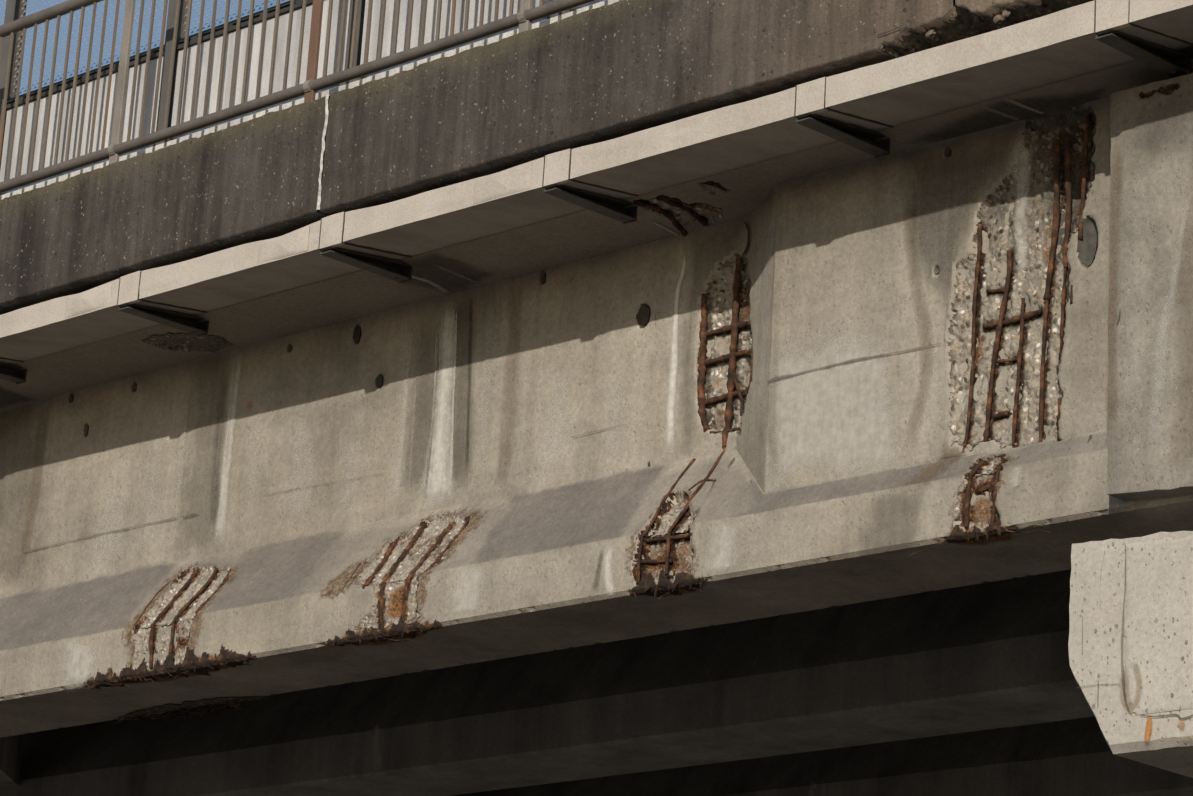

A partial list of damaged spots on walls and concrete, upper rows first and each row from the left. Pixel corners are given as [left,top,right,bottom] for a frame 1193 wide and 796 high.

spalling [881,0,1081,58]
spalling [633,181,730,237]
spalling [908,105,1096,557]
spalling [625,253,753,601]
spalling [69,564,256,693]
spalling [324,509,484,650]